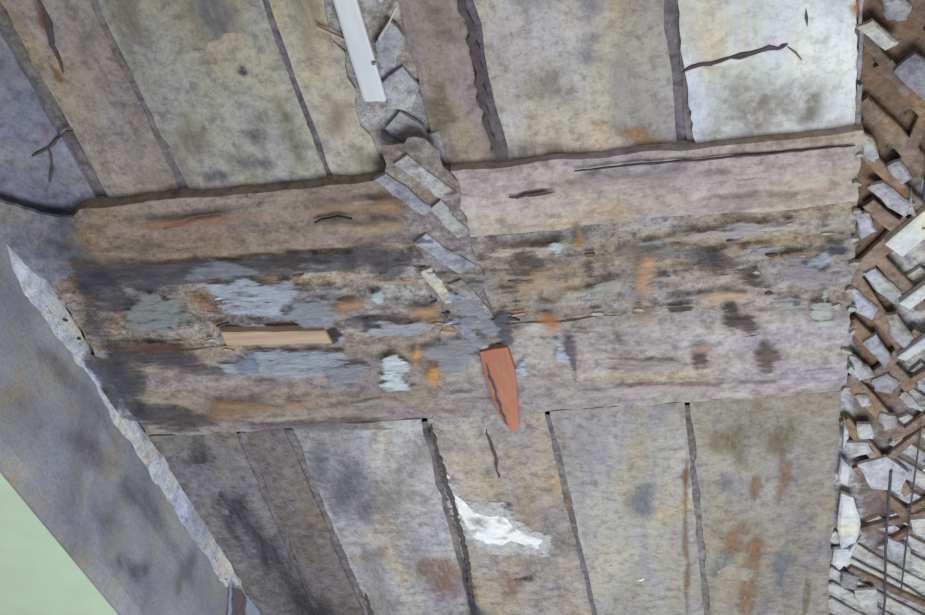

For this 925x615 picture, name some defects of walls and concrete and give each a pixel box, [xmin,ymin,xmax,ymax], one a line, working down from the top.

crack [682,43,802,73]
crack [509,190,555,199]
crack [574,144,855,172]
leakage [57,248,422,333]
leakage [326,327,343,344]
peeling [107,242,595,377]
peeling [562,197,857,332]
leakage [722,305,761,337]
flaking render [6,244,261,615]
leakage [86,345,225,433]
flaking render [447,474,553,557]
flaking render [832,415,861,570]